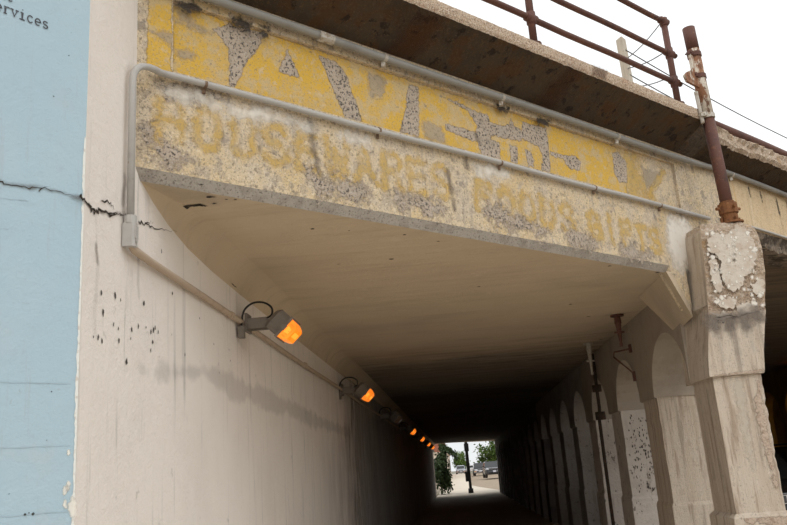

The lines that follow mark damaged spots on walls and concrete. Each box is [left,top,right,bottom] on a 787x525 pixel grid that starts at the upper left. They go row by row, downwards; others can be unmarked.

crack [0,181,177,232]
peeling [304,165,373,204]
peeling [394,189,448,219]
peeling [483,200,552,244]
peeling [705,222,765,323]